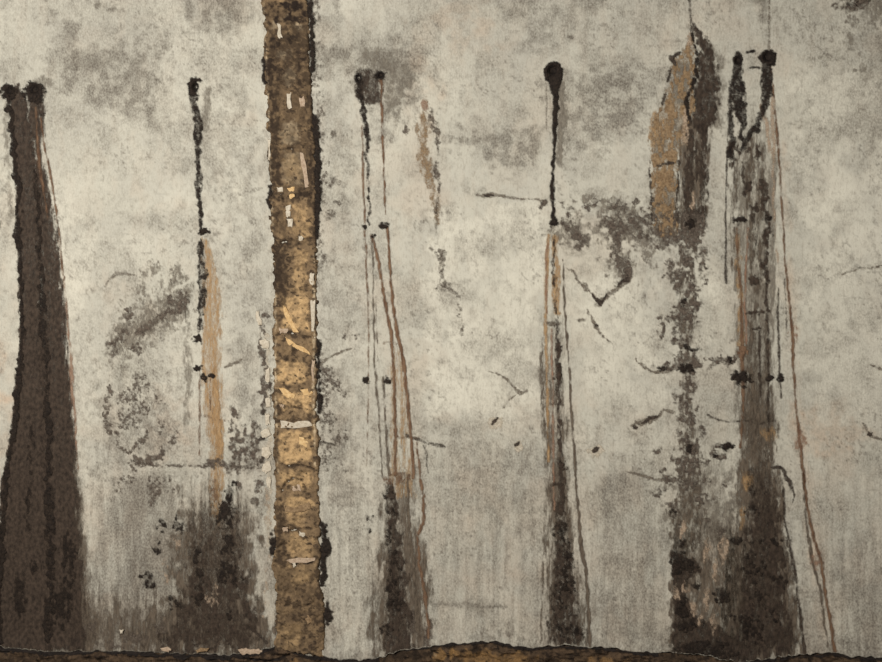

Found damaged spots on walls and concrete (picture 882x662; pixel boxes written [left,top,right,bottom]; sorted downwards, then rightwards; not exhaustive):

damp [831,0,882,44]
damp [0,77,277,655]
spalling [0,0,338,662]
damp [322,367,346,397]
damp [354,49,433,658]
crack [571,268,632,342]
crack [635,358,674,374]
damp [538,23,836,662]
damp [321,401,348,471]
spalling [352,641,734,662]
spalling [756,652,882,662]